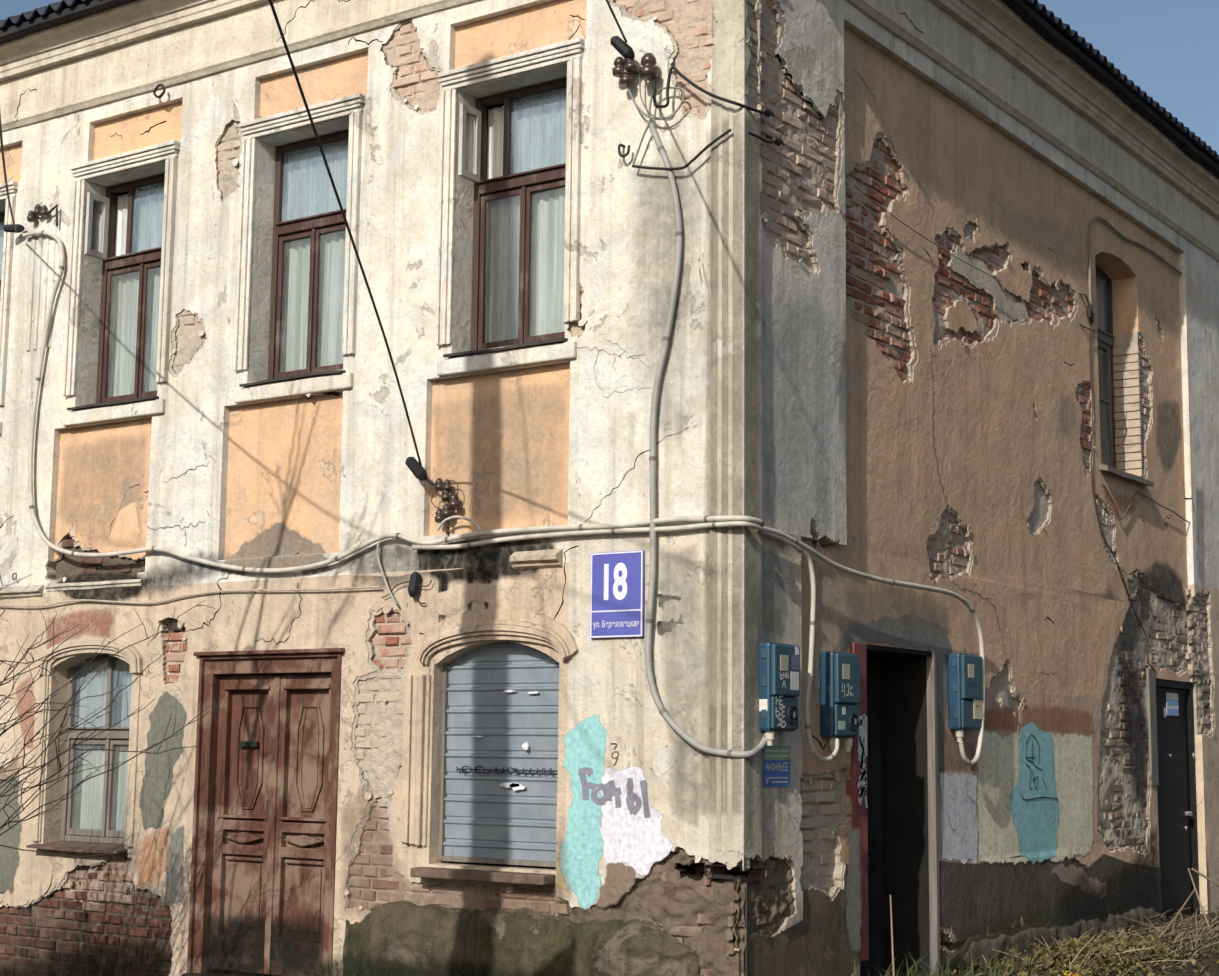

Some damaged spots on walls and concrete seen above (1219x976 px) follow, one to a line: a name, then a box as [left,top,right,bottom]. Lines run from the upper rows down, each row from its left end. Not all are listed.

crack [278,0,350,40]
crack [348,36,383,45]
flaking render [380,19,440,115]
flaking render [609,0,718,120]
flaking render [745,0,919,384]
flaking render [169,309,208,377]
flaking render [931,218,1078,350]
flaking render [926,505,975,583]
damp [1142,562,1185,603]
flaking render [1095,494,1215,856]
flaking render [344,605,852,976]
flaking render [0,847,175,976]